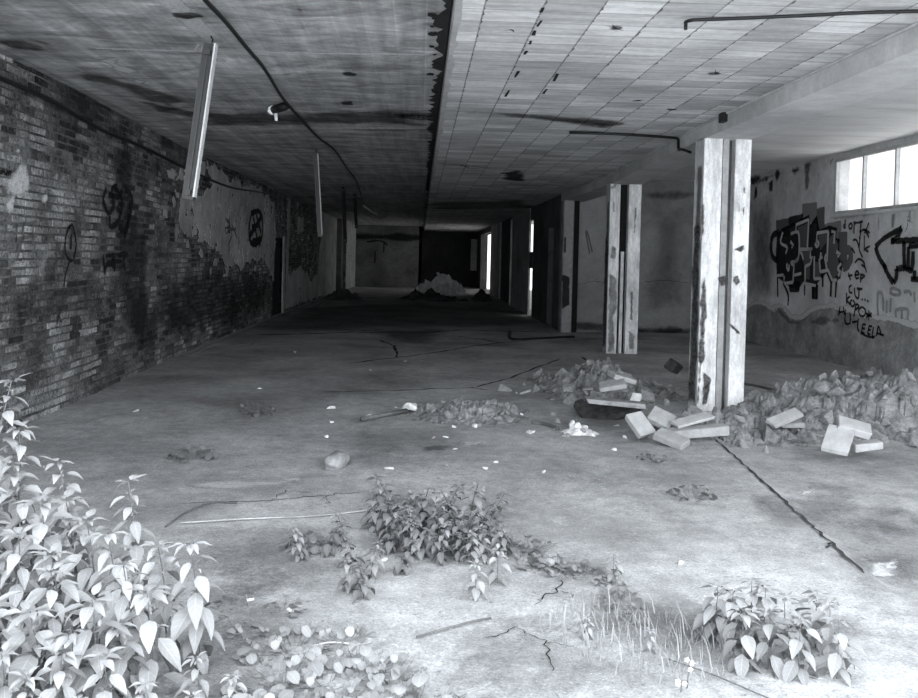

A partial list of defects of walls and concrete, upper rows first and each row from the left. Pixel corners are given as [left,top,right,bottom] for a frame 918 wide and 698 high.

spalling [426,0,463,191]
peeling [163,161,356,309]
crack [487,626,568,671]